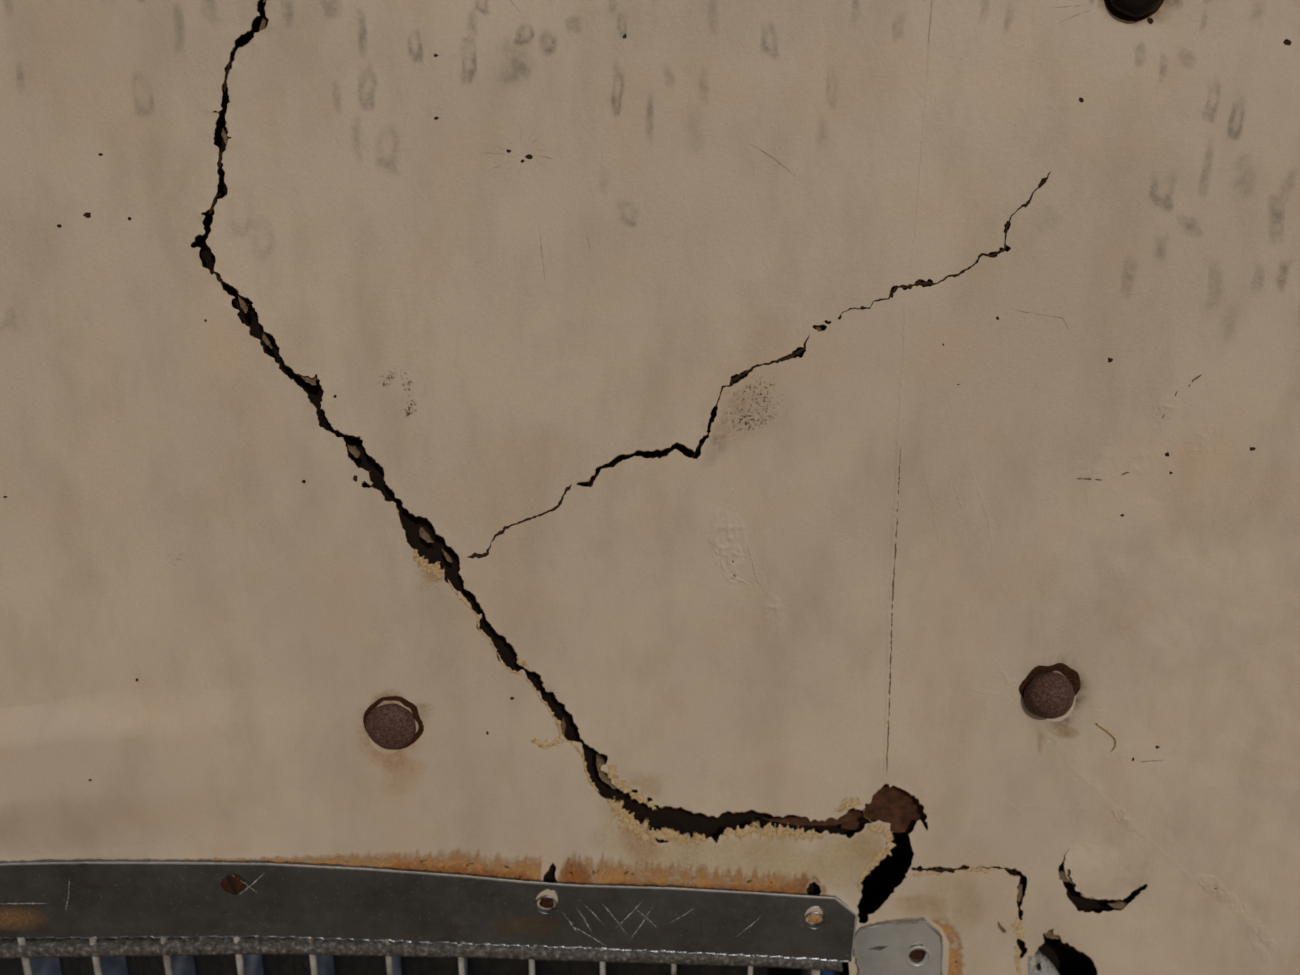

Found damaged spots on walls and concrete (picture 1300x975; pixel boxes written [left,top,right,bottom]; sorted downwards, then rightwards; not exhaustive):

crack [191,0,1051,847]
corrosion [187,851,541,880]
corrosion [560,860,807,893]
peeling [1064,821,1179,900]